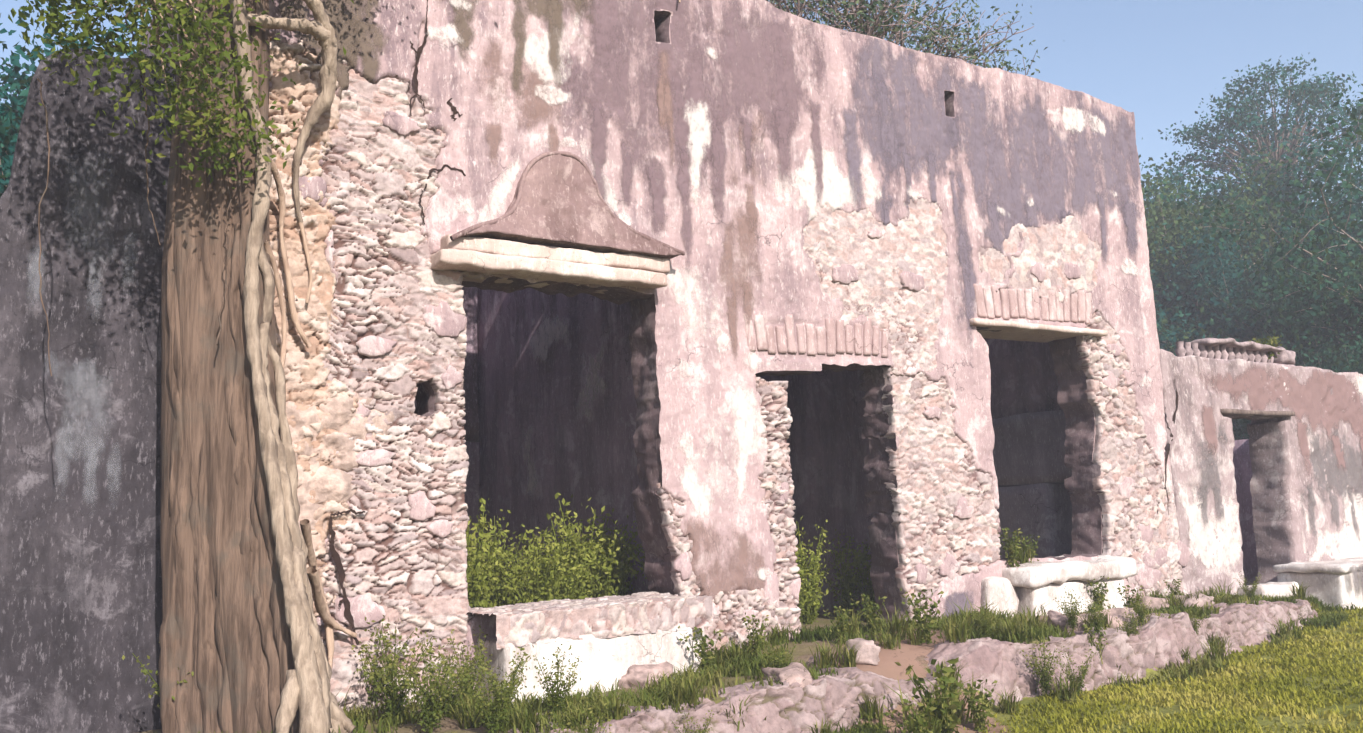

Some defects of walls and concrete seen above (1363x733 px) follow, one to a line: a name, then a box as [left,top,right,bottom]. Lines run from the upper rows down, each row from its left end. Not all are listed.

water stain [278,0,388,100]
spalling [268,36,487,713]
crack [410,0,462,121]
water stain [453,0,474,55]
water stain [485,0,824,355]
spalling [775,149,1001,621]
peeling [1121,259,1138,275]
spalling [1075,312,1241,605]